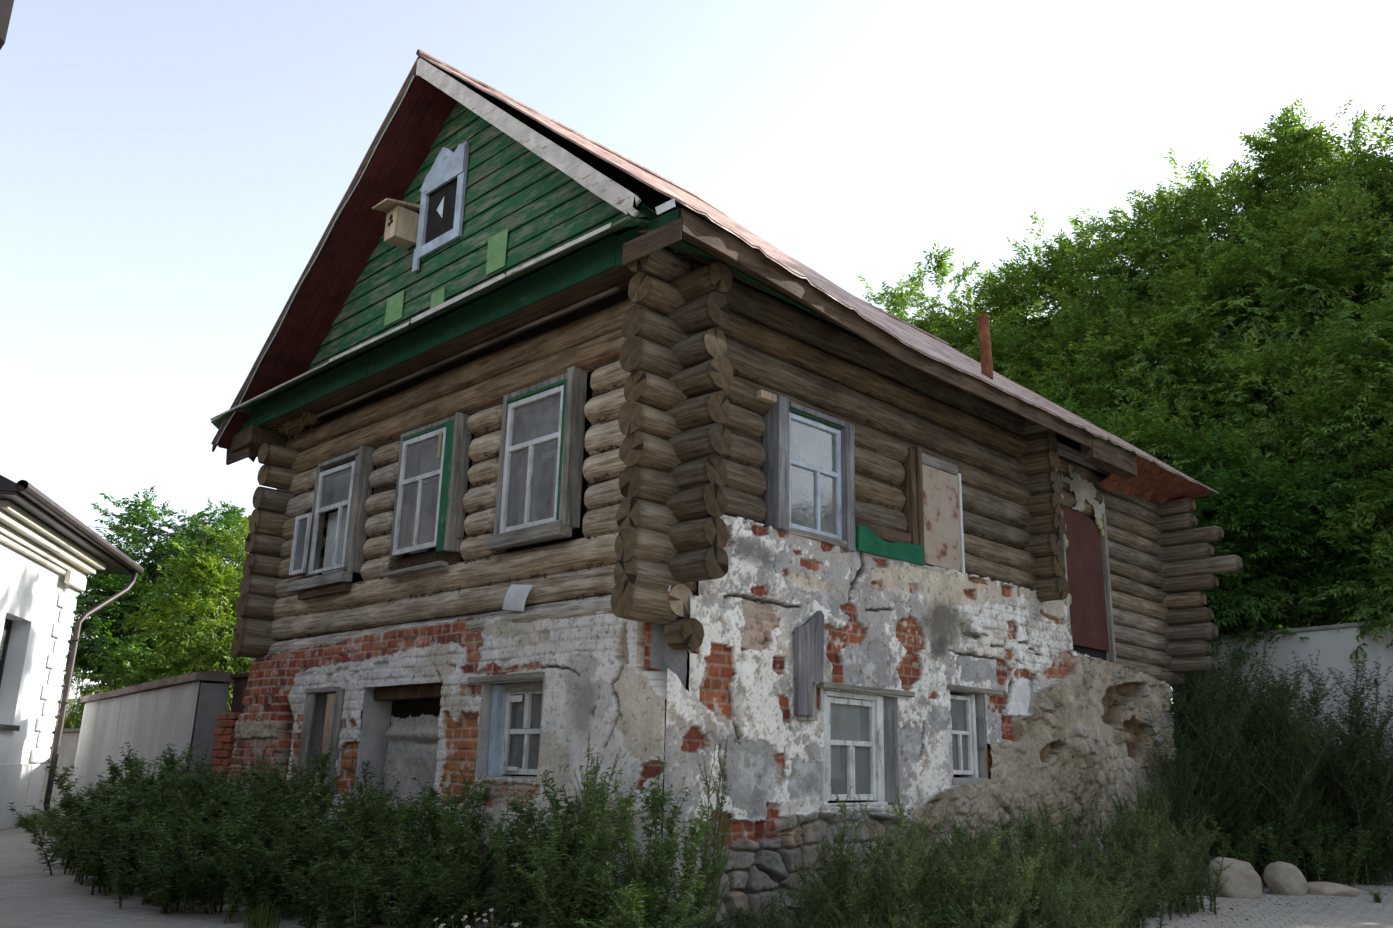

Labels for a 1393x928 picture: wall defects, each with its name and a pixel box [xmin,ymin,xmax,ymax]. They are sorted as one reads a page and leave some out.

spalling [225,599,614,807]
peeling [635,521,952,852]
peeling [870,557,1078,742]
spalling [1039,741,1064,763]
spalling [1102,682,1151,760]